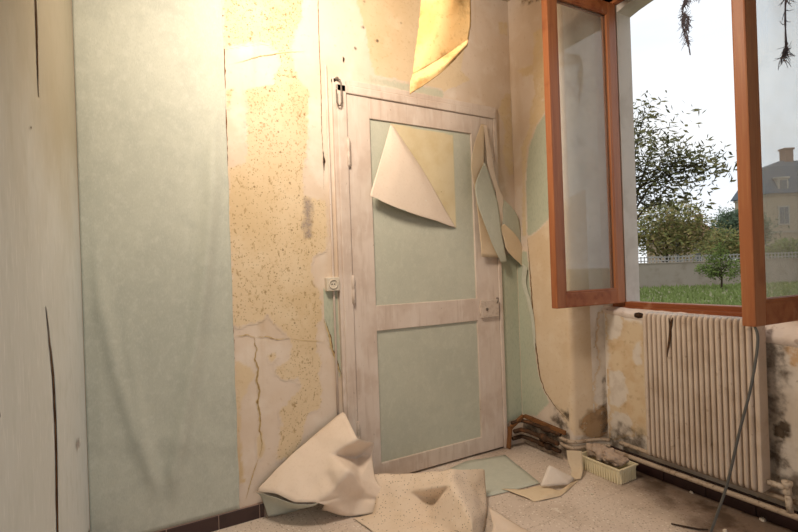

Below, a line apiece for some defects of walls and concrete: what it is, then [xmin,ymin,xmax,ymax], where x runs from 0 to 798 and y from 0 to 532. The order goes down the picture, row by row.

peeling [356,0,421,82]
peeling [425,49,472,93]
peeling [390,123,457,230]
peeling [222,0,331,463]
crack [241,334,325,501]
water stain [580,318,647,448]
water stain [768,396,790,465]